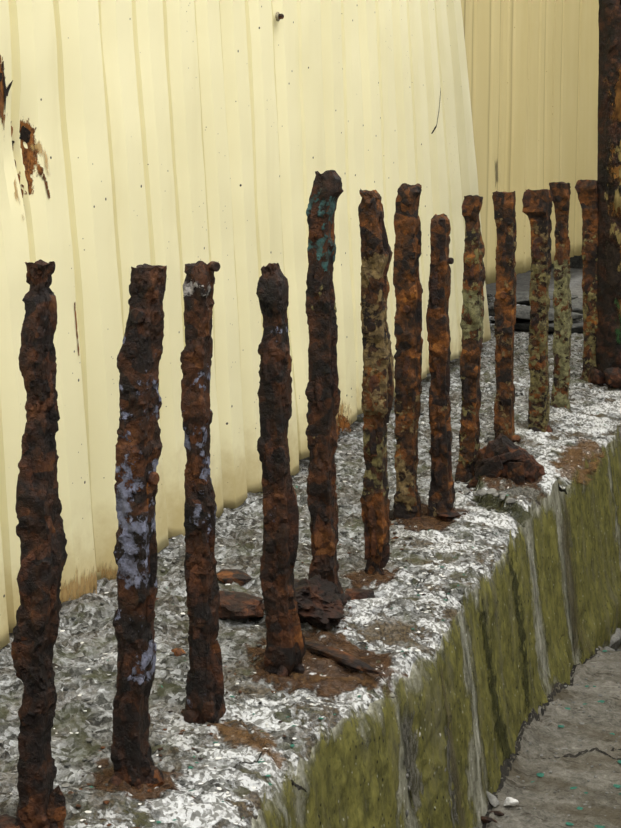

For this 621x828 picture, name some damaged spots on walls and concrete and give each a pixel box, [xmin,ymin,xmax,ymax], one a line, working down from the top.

rust [368,212,390,298]
rust [416,268,450,344]
rust [331,337,339,397]
rust [49,404,57,441]
rust [17,552,36,597]
rust [288,486,299,569]
rust [340,503,468,605]
leakage [563,500,592,656]
rust [239,598,408,700]
leakage [480,600,512,763]
leakage [509,551,530,712]
rust [81,756,182,805]